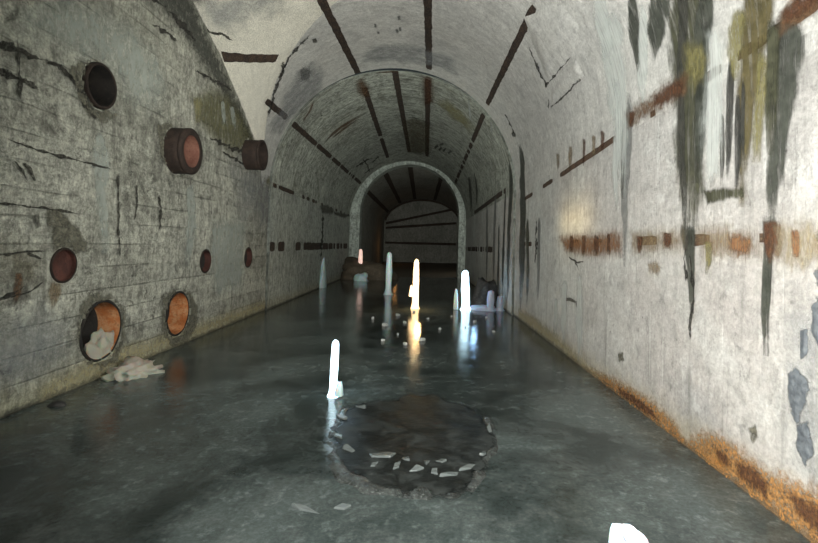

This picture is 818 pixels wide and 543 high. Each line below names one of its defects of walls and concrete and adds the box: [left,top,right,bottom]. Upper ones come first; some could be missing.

crack [0,41,97,118]
corrosion [626,76,687,126]
corrosion [543,131,616,188]
leakage [595,0,804,343]
corrosion [561,232,621,256]
crack [0,283,42,301]
peeling [800,298,818,359]
corrosion [519,311,818,543]
peeling [787,368,814,466]